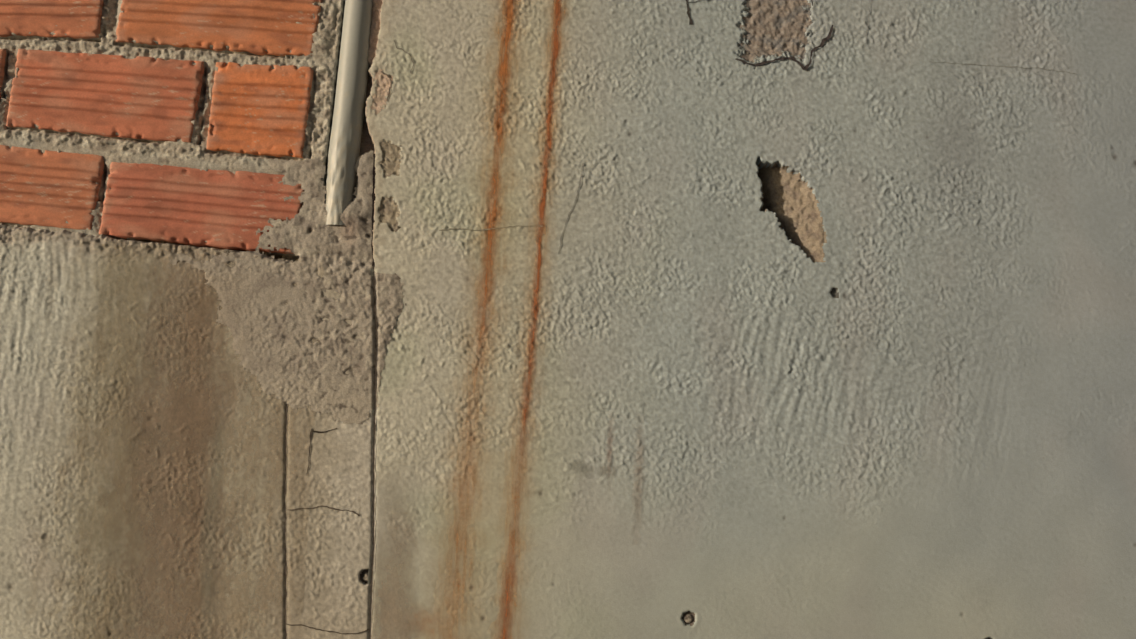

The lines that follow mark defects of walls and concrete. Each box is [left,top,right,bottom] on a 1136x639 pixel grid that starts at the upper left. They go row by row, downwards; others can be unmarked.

rust [496,0,513,152]
crack [686,0,701,25]
flaking render [738,0,813,69]
peeling [378,196,401,232]
peeling [379,139,402,178]
rust [529,0,565,380]
flaking render [758,162,827,263]
crack [284,154,377,639]
damp [95,262,287,639]